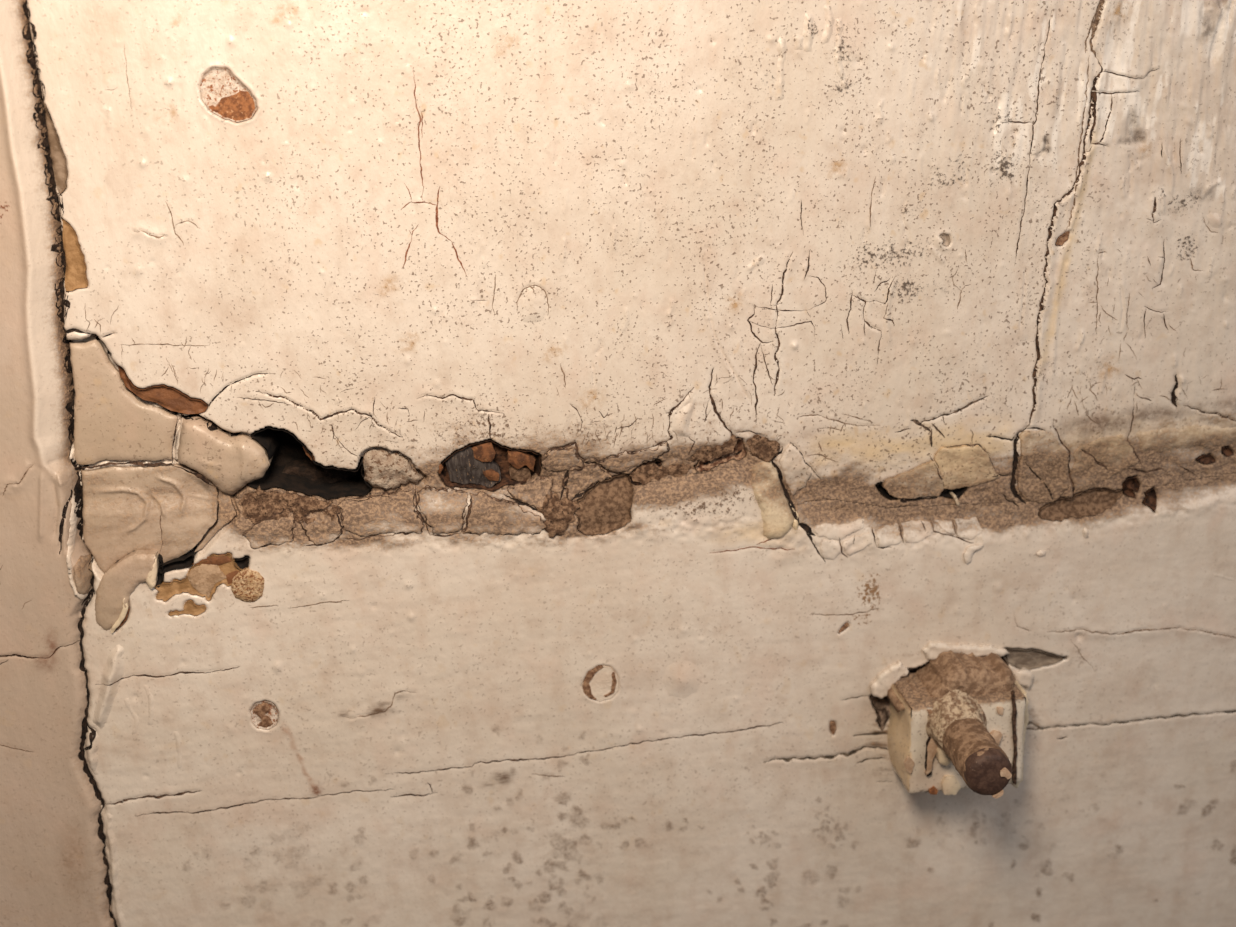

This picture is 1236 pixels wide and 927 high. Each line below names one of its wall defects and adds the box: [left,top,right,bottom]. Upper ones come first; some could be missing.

crack [504,0,1236,562]
peeling [118,366,208,414]
crack [0,0,780,927]
spalling [1195,446,1234,464]
peeling [575,459,662,535]
peeling [1038,476,1157,522]
peeling [814,517,983,564]
peeling [146,552,243,616]
crack [1014,616,1236,666]
crack [765,732,892,782]
crack [924,737,932,777]
crack [1011,690,1236,785]